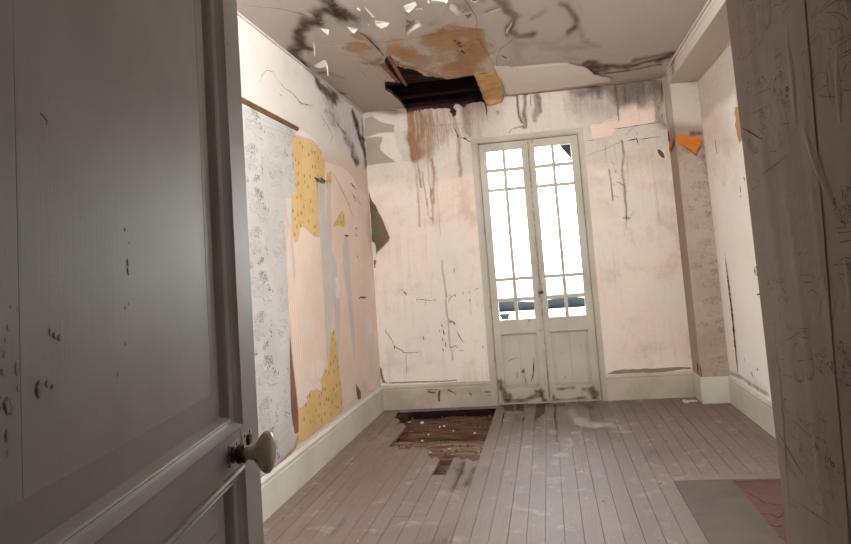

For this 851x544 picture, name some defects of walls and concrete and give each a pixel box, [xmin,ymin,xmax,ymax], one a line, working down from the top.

leakage [288,0,358,67]
crack [241,0,507,77]
leakage [387,25,492,79]
leakage [316,72,345,113]
leakage [344,108,367,167]
leakage [407,111,444,179]
spalling [405,99,487,116]
flaking render [590,100,655,139]
crack [385,321,463,371]
flaking render [290,341,299,434]